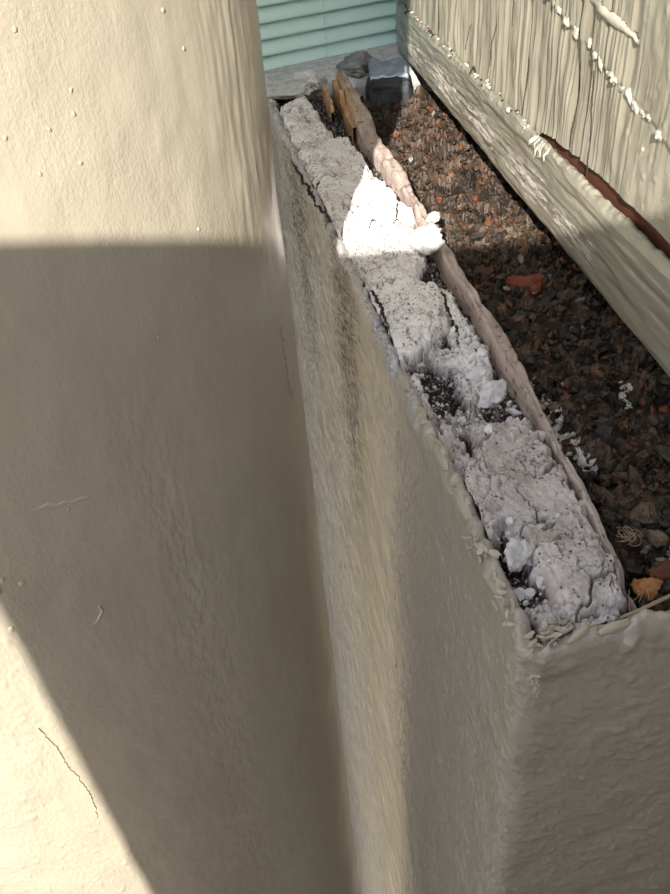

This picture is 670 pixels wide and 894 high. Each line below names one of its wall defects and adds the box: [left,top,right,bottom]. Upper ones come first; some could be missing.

crack [487,0,533,114]
peeling [399,26,600,268]
crack [569,62,594,180]
peeling [461,520,501,564]
peeling [484,570,580,699]